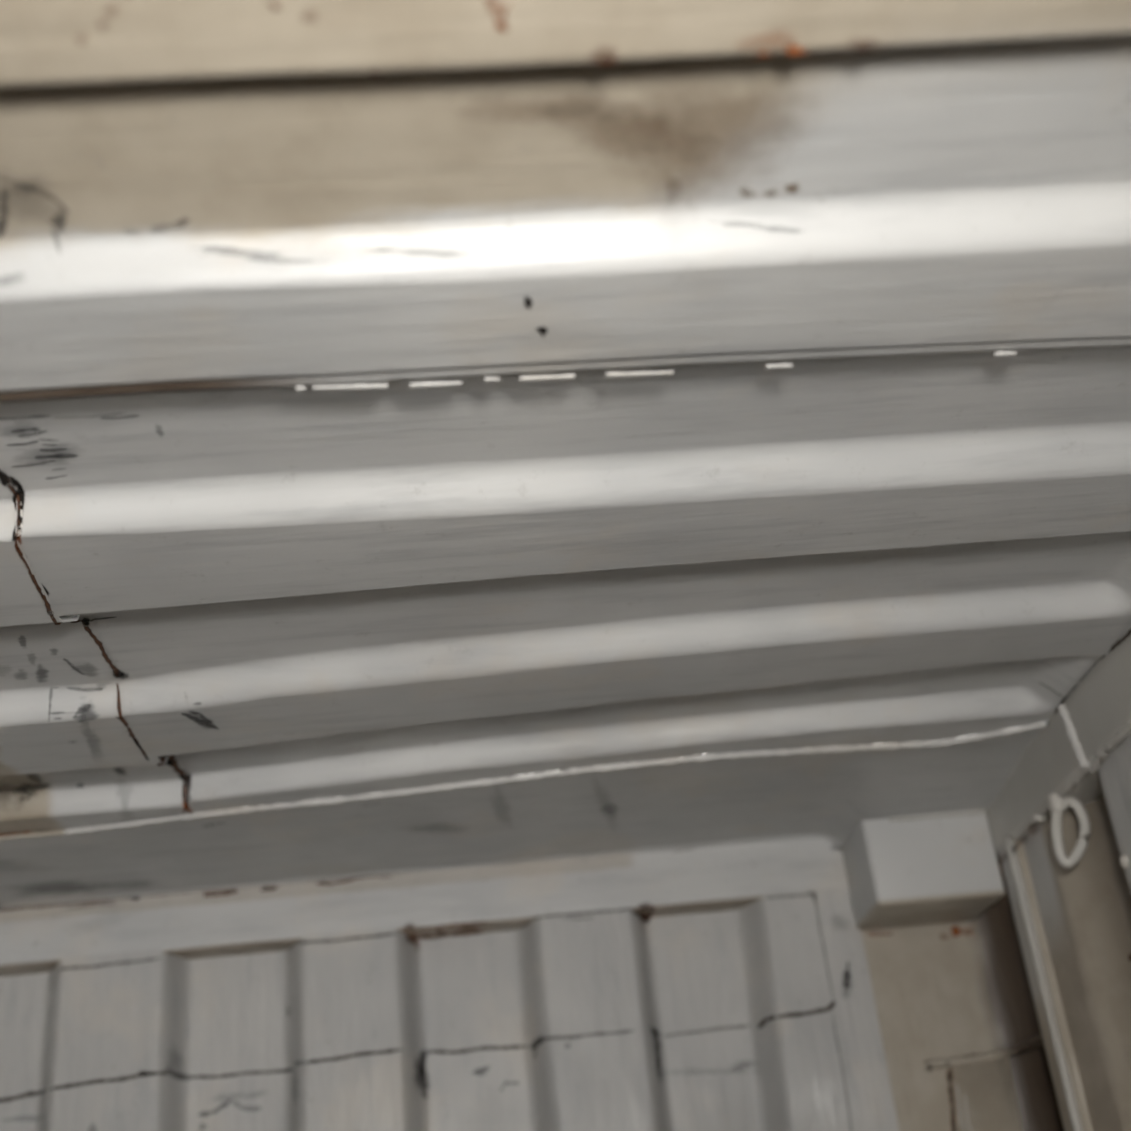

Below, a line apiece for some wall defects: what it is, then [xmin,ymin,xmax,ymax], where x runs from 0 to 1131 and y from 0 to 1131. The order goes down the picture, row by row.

crack [0,470,189,810]
crack [1039,629,1131,726]
crack [758,1001,836,1029]
crack [0,1030,635,1103]